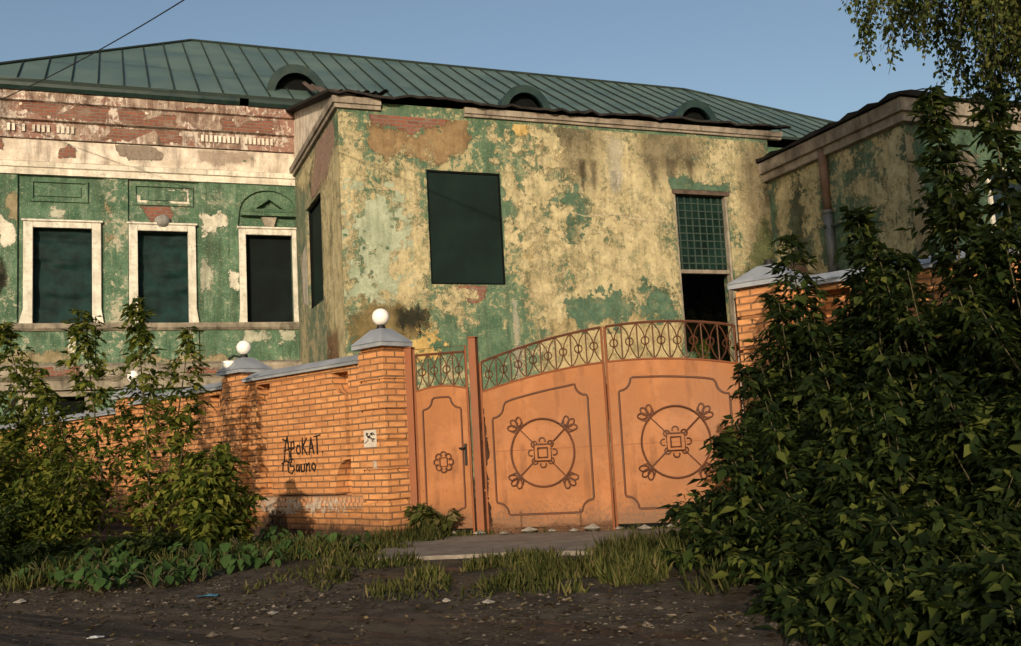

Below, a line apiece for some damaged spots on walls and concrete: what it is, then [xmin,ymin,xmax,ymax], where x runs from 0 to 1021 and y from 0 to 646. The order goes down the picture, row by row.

flaking render [19,102,210,161]
peeling [0,191,17,247]
peeling [296,111,487,358]
peeling [488,124,935,379]
leakage [346,295,439,344]
peeling [409,323,449,375]